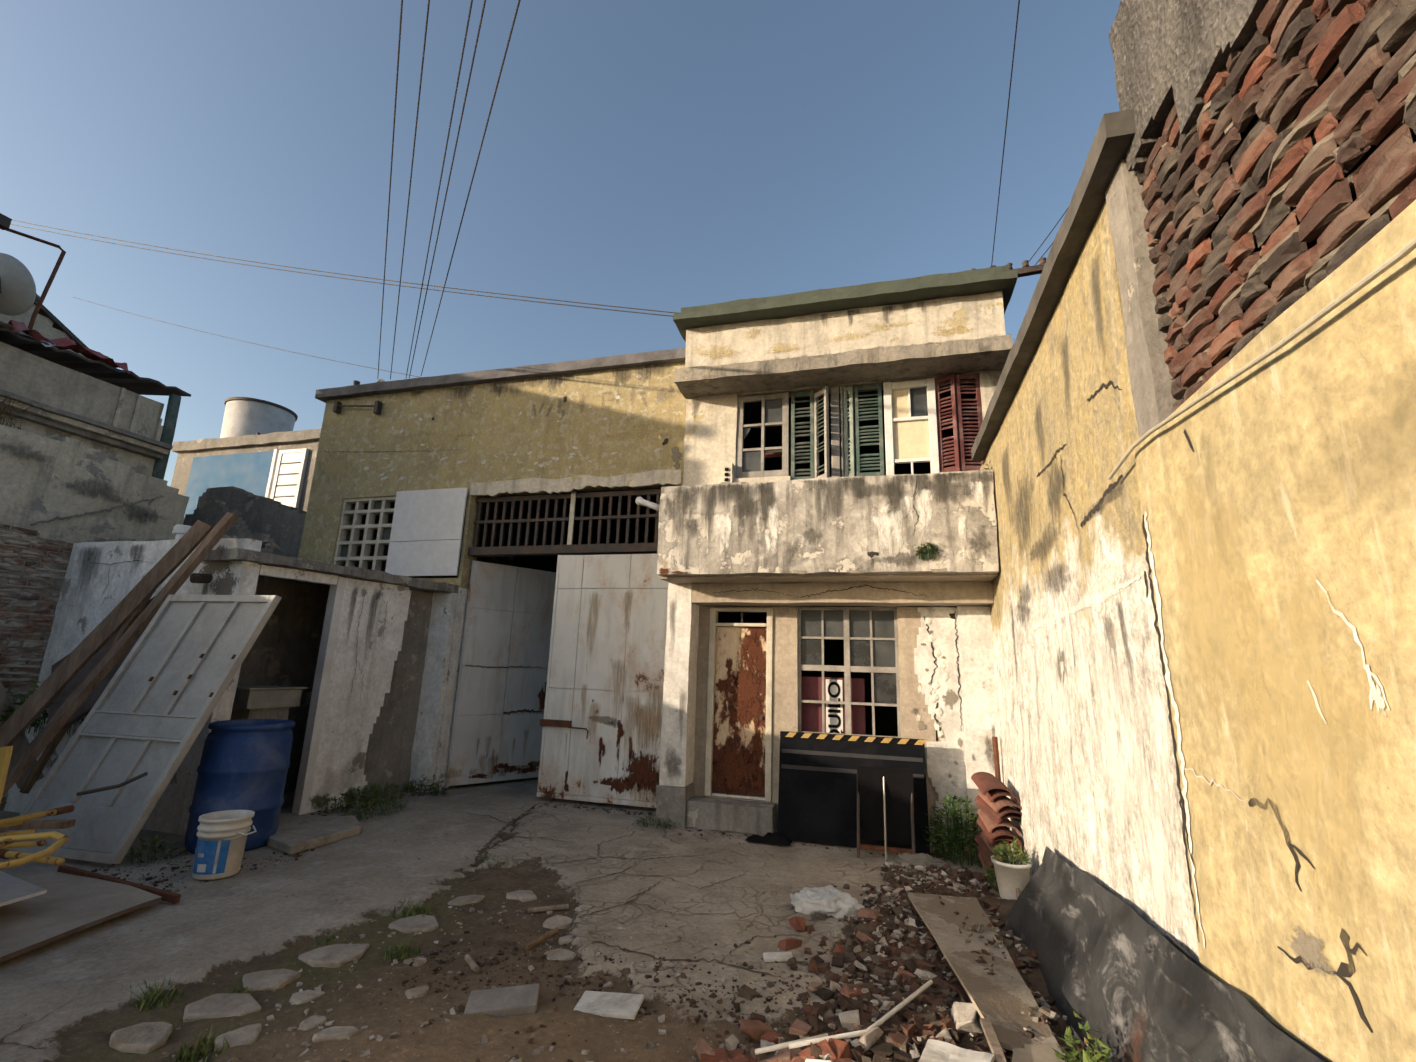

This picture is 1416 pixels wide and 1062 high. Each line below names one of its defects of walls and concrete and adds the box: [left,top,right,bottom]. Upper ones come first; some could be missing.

leakage [1092,264,1101,324]
crack [1087,380,1121,401]
crack [1183,430,1194,452]
leakage [665,483,778,554]
corrosion [503,687,543,715]
corrosion [712,621,767,798]
peeling [914,616,949,741]
leakage [805,454,1176,936]
crack [1032,444,1315,948]
corrosion [469,761,540,779]
corrosion [593,721,660,795]
crack [1277,926,1372,1033]